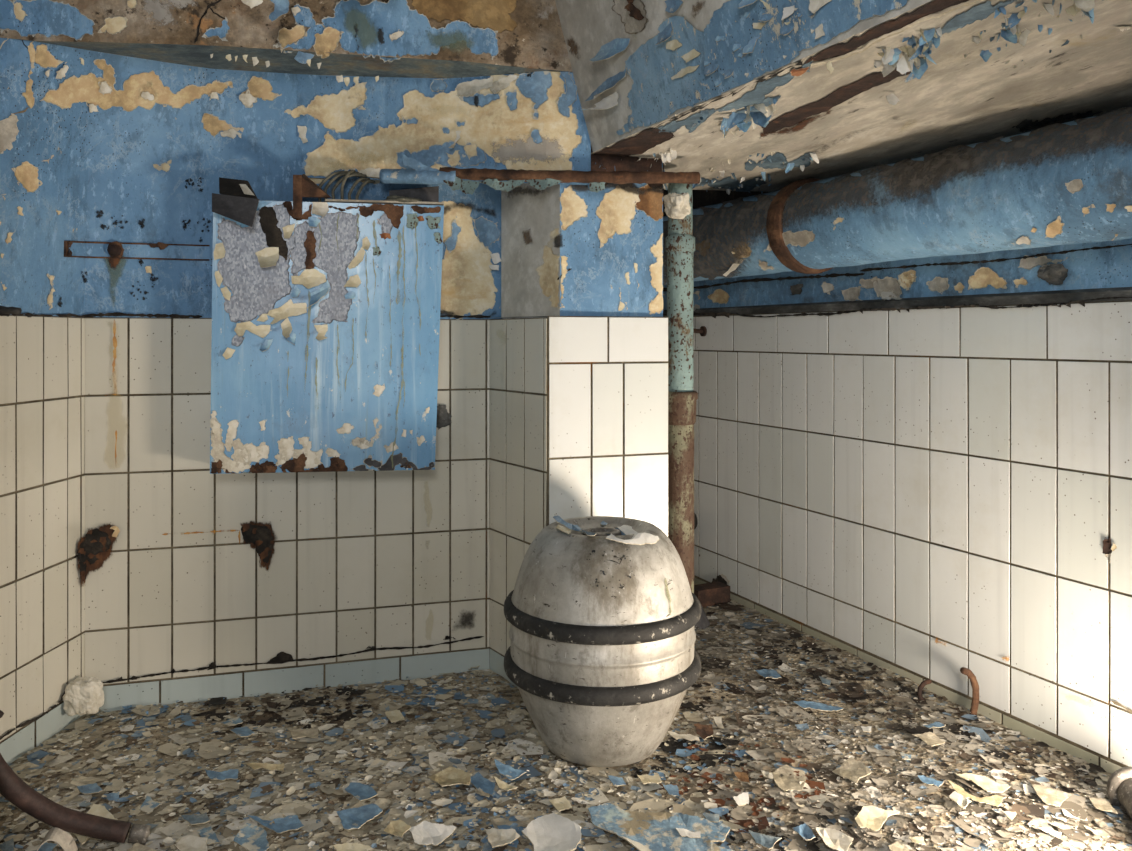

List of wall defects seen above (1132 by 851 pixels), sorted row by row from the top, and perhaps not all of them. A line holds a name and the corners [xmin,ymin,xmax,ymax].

peeling [241,0,518,69]
flaking render [0,0,282,139]
flaking render [0,113,19,154]
flaking render [11,155,54,192]
peeling [153,160,172,172]
peeling [284,0,1106,320]
peeling [1082,204,1132,216]
peeling [47,274,55,310]
peeling [213,184,371,359]
peeling [373,384,385,397]
spalling [425,404,452,430]
peeling [210,411,435,474]